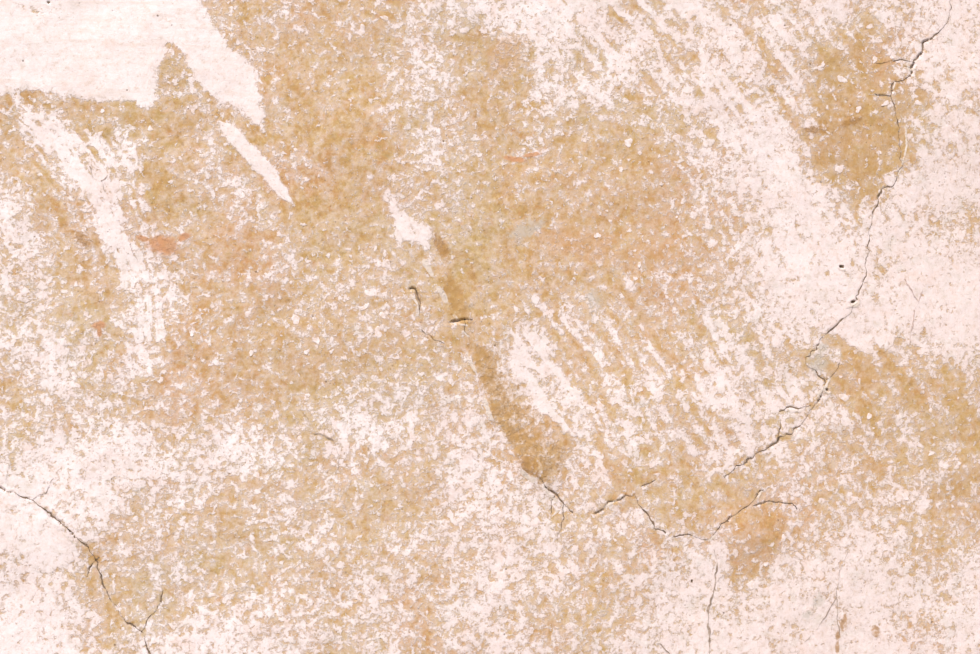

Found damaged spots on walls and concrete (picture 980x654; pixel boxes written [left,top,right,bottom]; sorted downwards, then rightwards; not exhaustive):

crack [409,288,473,343]
crack [727,6,952,475]
crack [0,487,163,654]
crack [540,478,797,654]
crack [783,550,848,654]